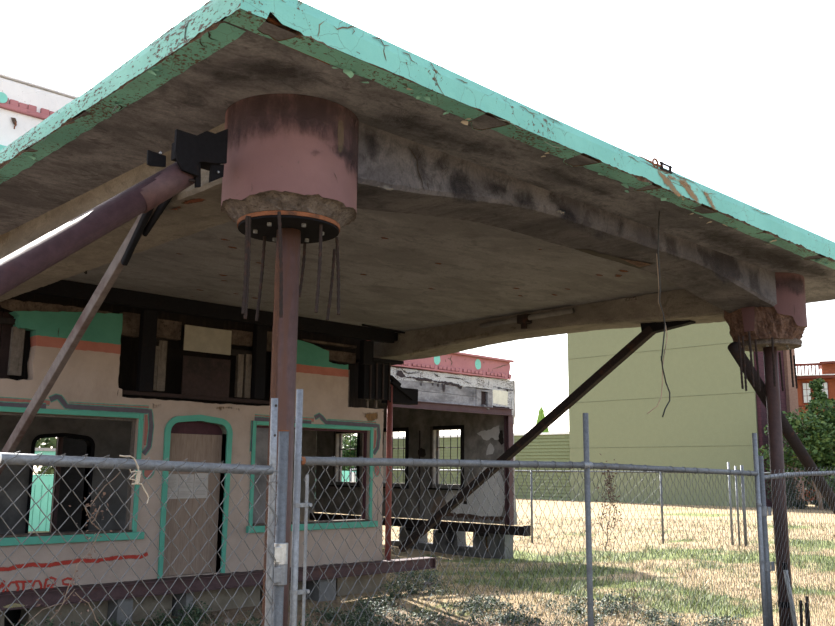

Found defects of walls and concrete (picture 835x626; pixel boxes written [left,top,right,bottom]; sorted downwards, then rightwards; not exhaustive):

crack [302,21,467,96]
crack [497,106,562,130]
spalling [0,8,835,269]
spalling [724,306,808,342]
peeling [396,370,462,389]